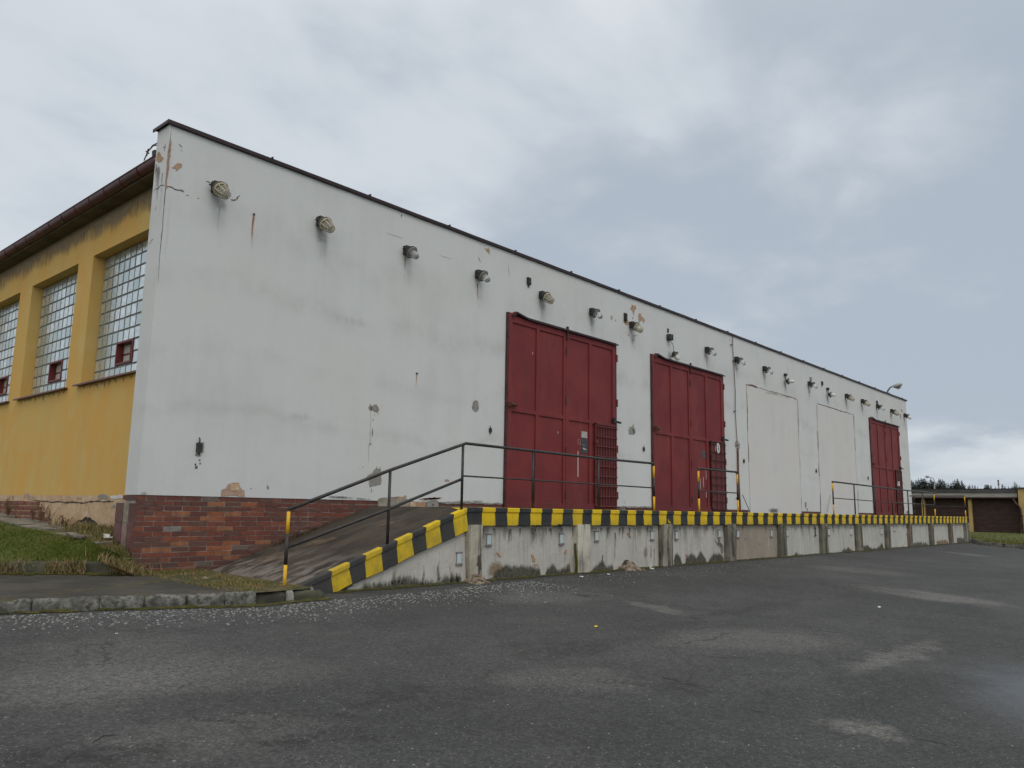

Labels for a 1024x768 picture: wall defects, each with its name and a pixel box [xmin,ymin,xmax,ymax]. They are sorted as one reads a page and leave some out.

peeling [156,139,182,189]
crack [149,181,210,278]
peeling [611,305,645,336]
flaking render [221,483,245,497]
damp [363,567,461,588]
damp [477,554,570,579]
damp [592,556,613,571]
damp [674,540,725,564]